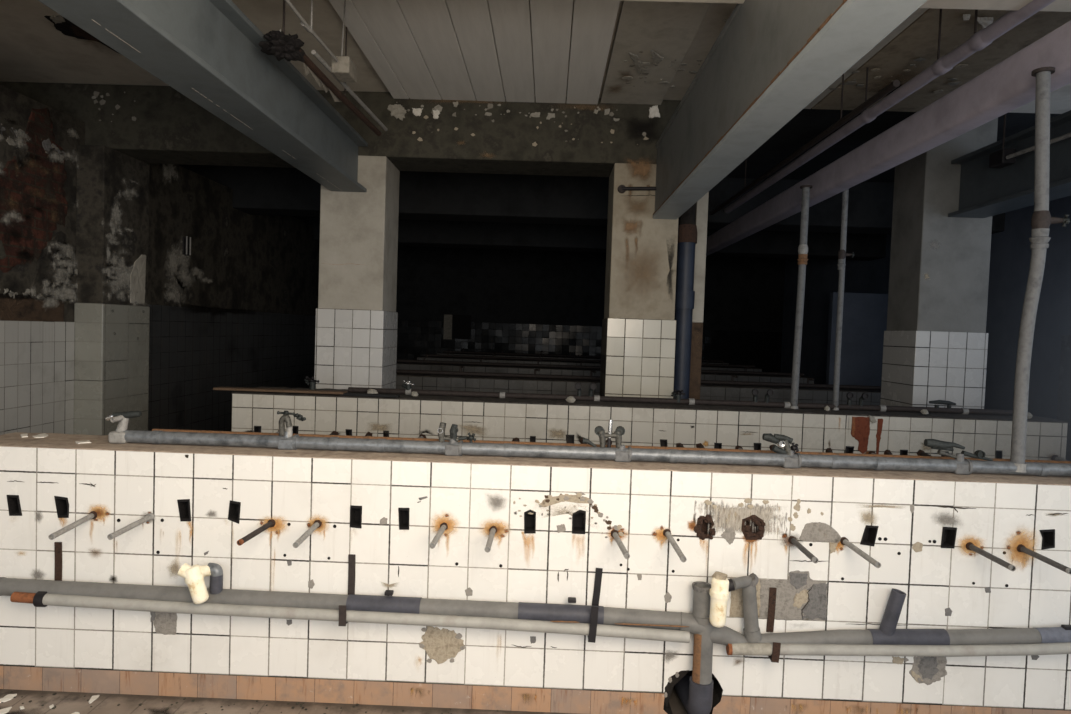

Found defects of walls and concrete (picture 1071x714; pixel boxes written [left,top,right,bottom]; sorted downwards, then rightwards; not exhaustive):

peeling [0,288,64,322]
corrosion [851,415,883,454]
corrosion [92,507,109,521]
corrosion [484,523,508,539]
peeling [513,492,624,538]
corrosion [689,514,716,540]
corrosion [742,515,765,553]
peeling [694,498,841,554]
corrosion [1007,531,1034,563]
spalling [756,570,828,621]
spalling [419,626,465,664]
spalling [892,656,947,685]